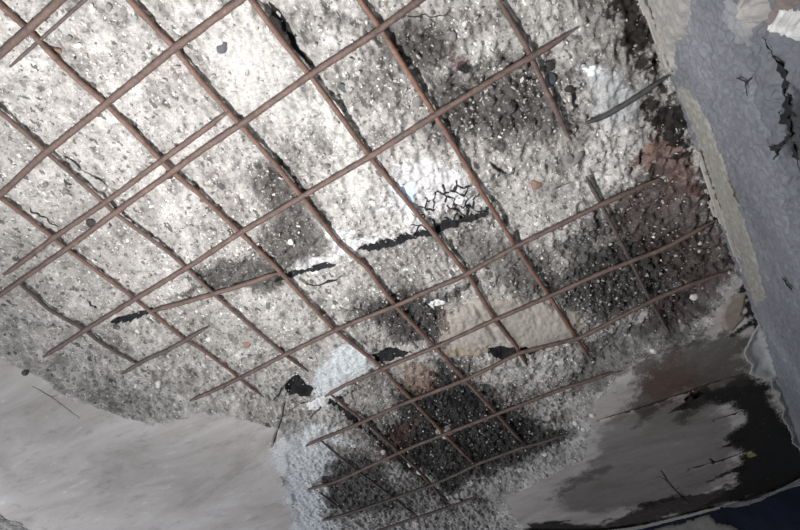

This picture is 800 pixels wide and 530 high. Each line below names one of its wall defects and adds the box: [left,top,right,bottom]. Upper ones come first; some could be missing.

damp [575,0,693,168]
crack [762,37,800,171]
crack [357,181,489,252]
corrosion [611,132,734,337]
damp [698,193,717,227]
crack [274,262,345,286]
efflorescence [312,343,373,400]
damp [368,360,577,513]
damp [528,285,800,530]
spalling [0,514,29,530]
peeling [612,479,800,530]